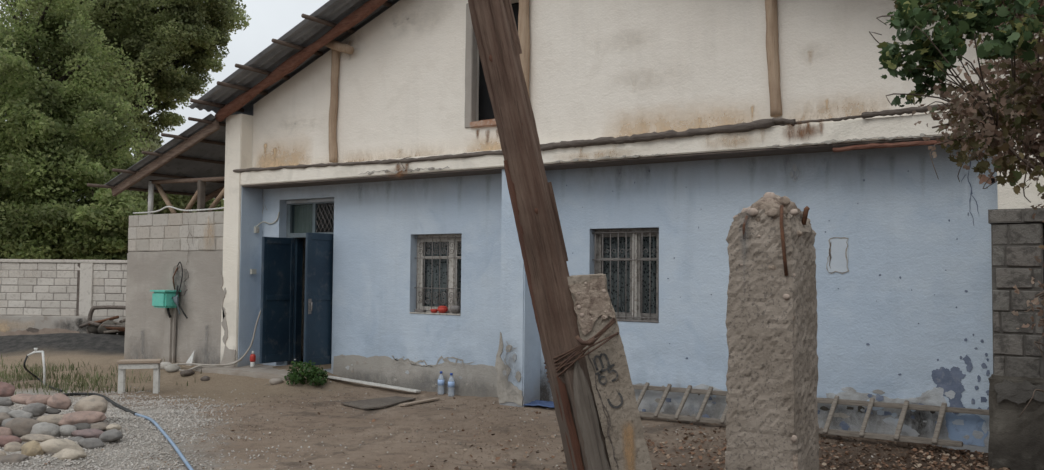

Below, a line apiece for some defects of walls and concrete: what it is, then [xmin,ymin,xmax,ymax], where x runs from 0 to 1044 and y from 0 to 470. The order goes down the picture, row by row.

leakage [621,117,740,136]
flaking render [333,332,523,406]
flaking render [817,334,1044,448]